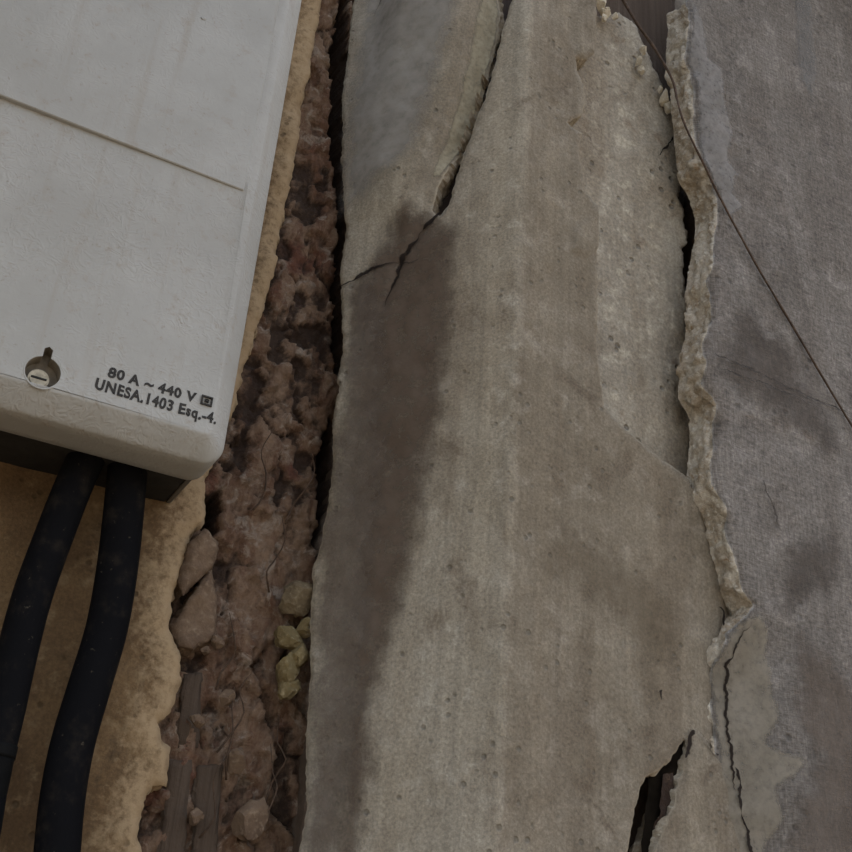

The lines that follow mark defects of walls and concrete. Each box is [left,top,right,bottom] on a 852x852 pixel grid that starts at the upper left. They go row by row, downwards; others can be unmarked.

crack [483,43,500,103]
peeling [690,9,741,214]
crack [339,151,465,304]
spalling [572,0,690,476]
crack [685,607,753,852]